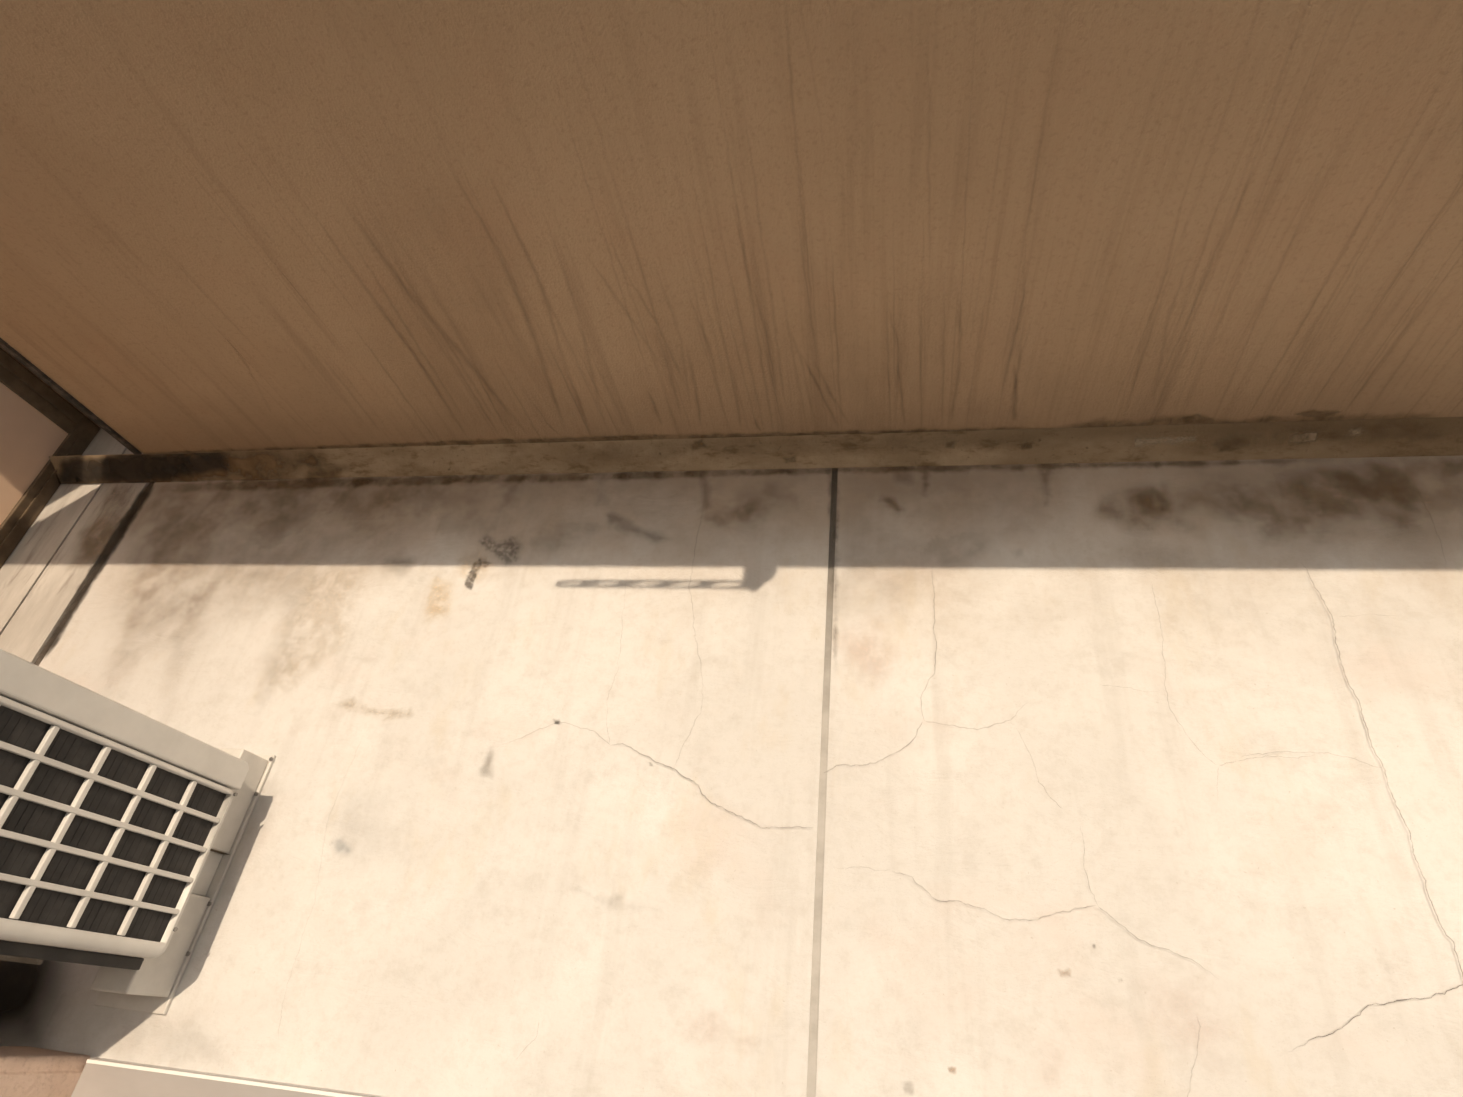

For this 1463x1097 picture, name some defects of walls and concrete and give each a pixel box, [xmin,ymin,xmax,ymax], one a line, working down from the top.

damp [42,491,150,651]
crack [637,739,750,821]
crack [1313,589,1463,1039]